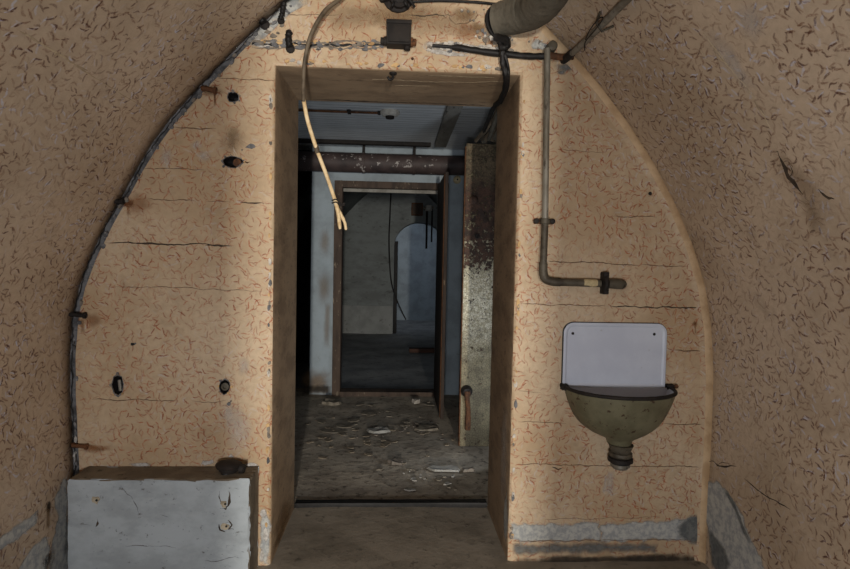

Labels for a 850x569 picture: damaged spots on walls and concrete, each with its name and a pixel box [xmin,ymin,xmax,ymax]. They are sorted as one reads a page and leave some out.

crack [777,151,834,200]
crack [70,0,330,476]
crack [550,260,686,268]
water stain [706,480,764,569]